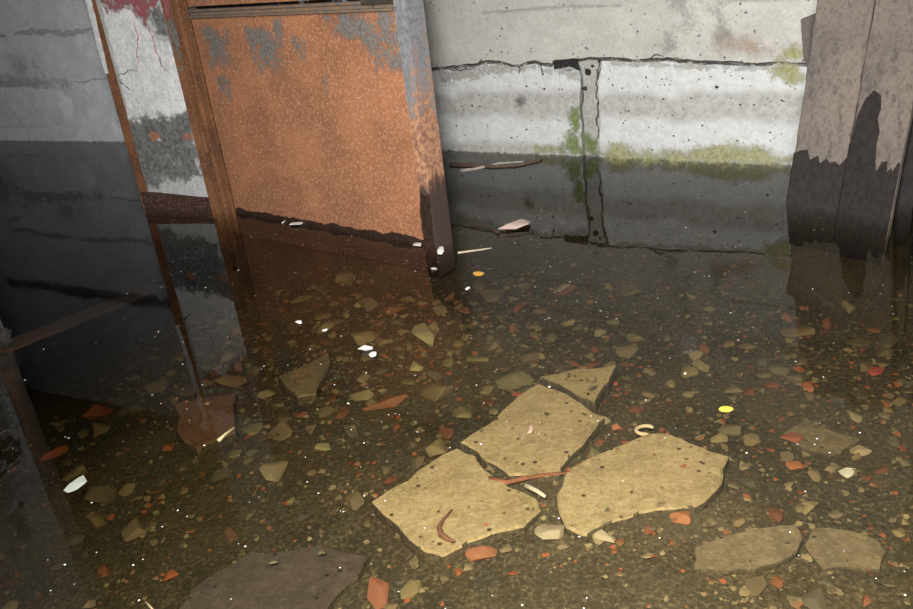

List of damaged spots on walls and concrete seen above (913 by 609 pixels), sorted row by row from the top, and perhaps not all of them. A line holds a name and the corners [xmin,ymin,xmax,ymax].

peeling [85,0,187,144]
crack [446,54,798,143]
damp [582,134,599,155]